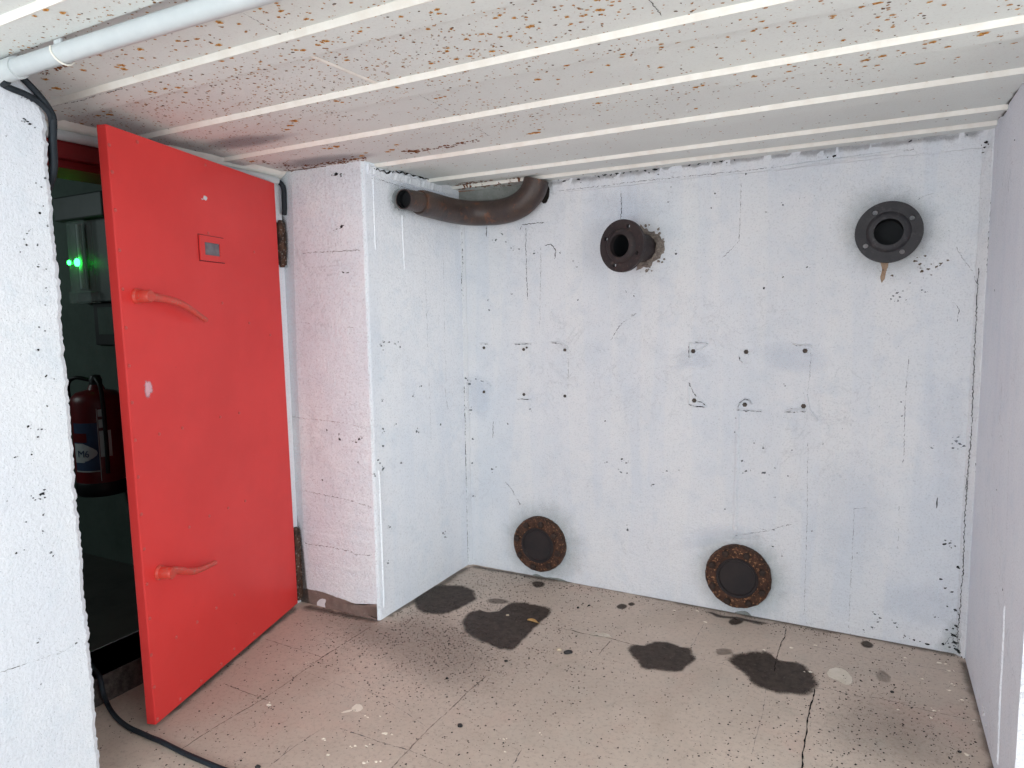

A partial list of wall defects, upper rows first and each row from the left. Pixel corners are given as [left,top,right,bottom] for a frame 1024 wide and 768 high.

corrosion [0,0,161,55]
corrosion [40,0,959,172]
damp [415,585,550,650]
damp [629,641,695,672]
damp [728,651,818,694]